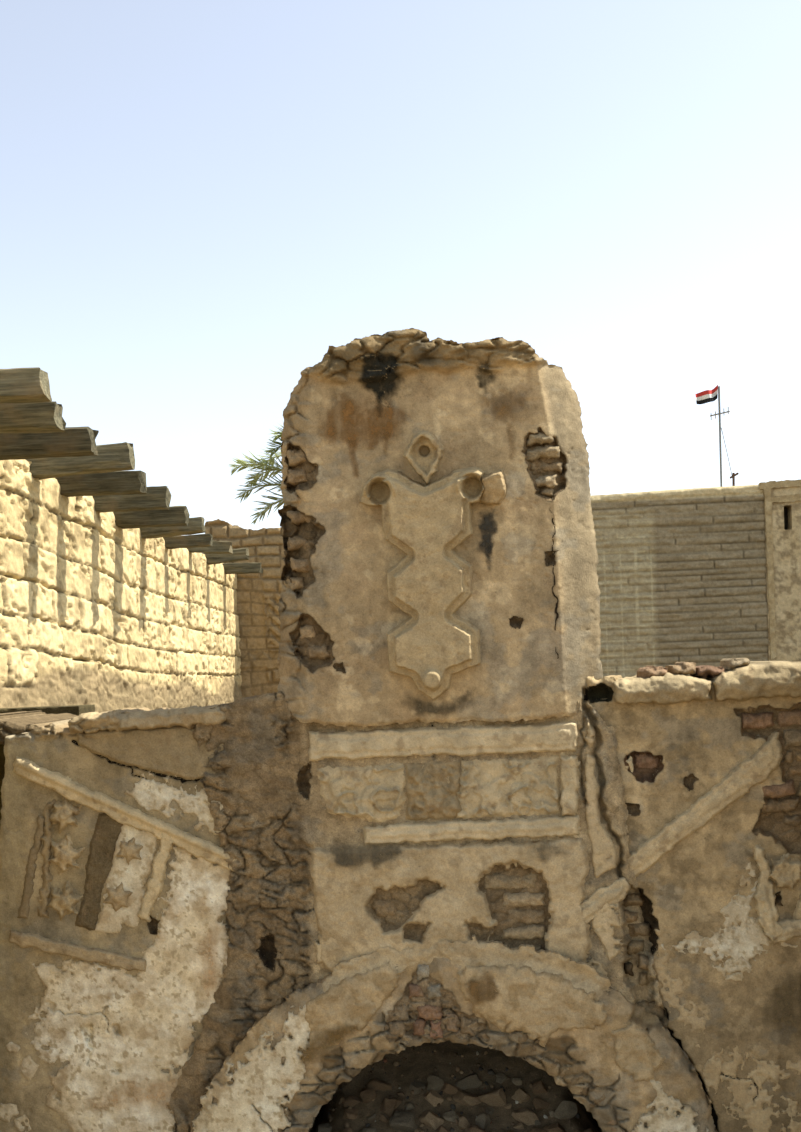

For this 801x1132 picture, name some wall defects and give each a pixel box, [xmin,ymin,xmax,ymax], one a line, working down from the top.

spalling [278,441,325,599]
damp [326,391,403,476]
damp [479,513,497,556]
spalling [522,427,567,501]
flaking render [584,718,617,878]
spalling [734,702,801,854]
flaking render [6,824,230,1132]
spalling [467,862,551,951]
flaking render [586,862,801,1048]
flaking render [192,1004,311,1132]
flaking render [631,1079,709,1132]
crack [668,1029,758,1131]